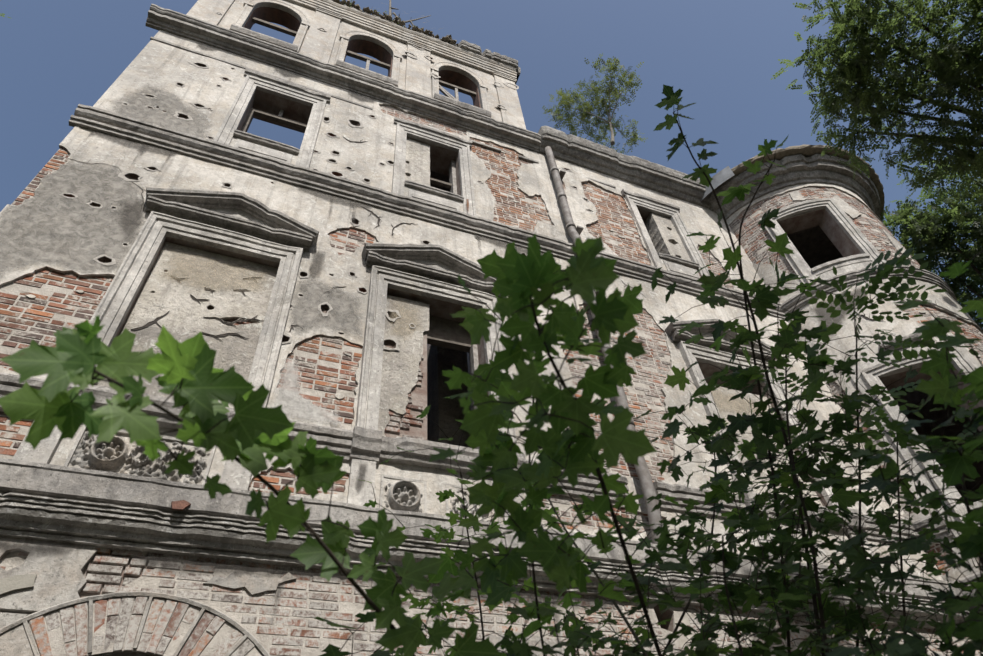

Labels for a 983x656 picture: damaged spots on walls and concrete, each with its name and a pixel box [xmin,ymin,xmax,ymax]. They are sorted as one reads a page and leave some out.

spalling [312,150,354,178]
spalling [347,105,552,232]
peeling [0,147,162,372]
spalling [328,216,377,255]
spalling [571,182,650,265]
crack [131,310,170,330]
crack [170,275,264,342]
spalling [276,271,368,430]
spalling [0,411,34,459]
spalling [384,355,424,440]
spalling [82,544,983,656]